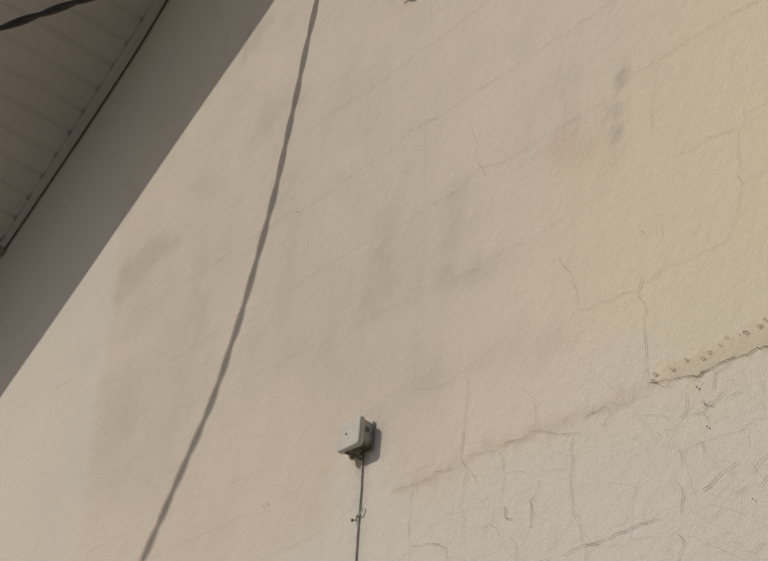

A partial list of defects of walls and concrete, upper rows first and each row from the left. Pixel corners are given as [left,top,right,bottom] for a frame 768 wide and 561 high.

crack [637,286,768,416]